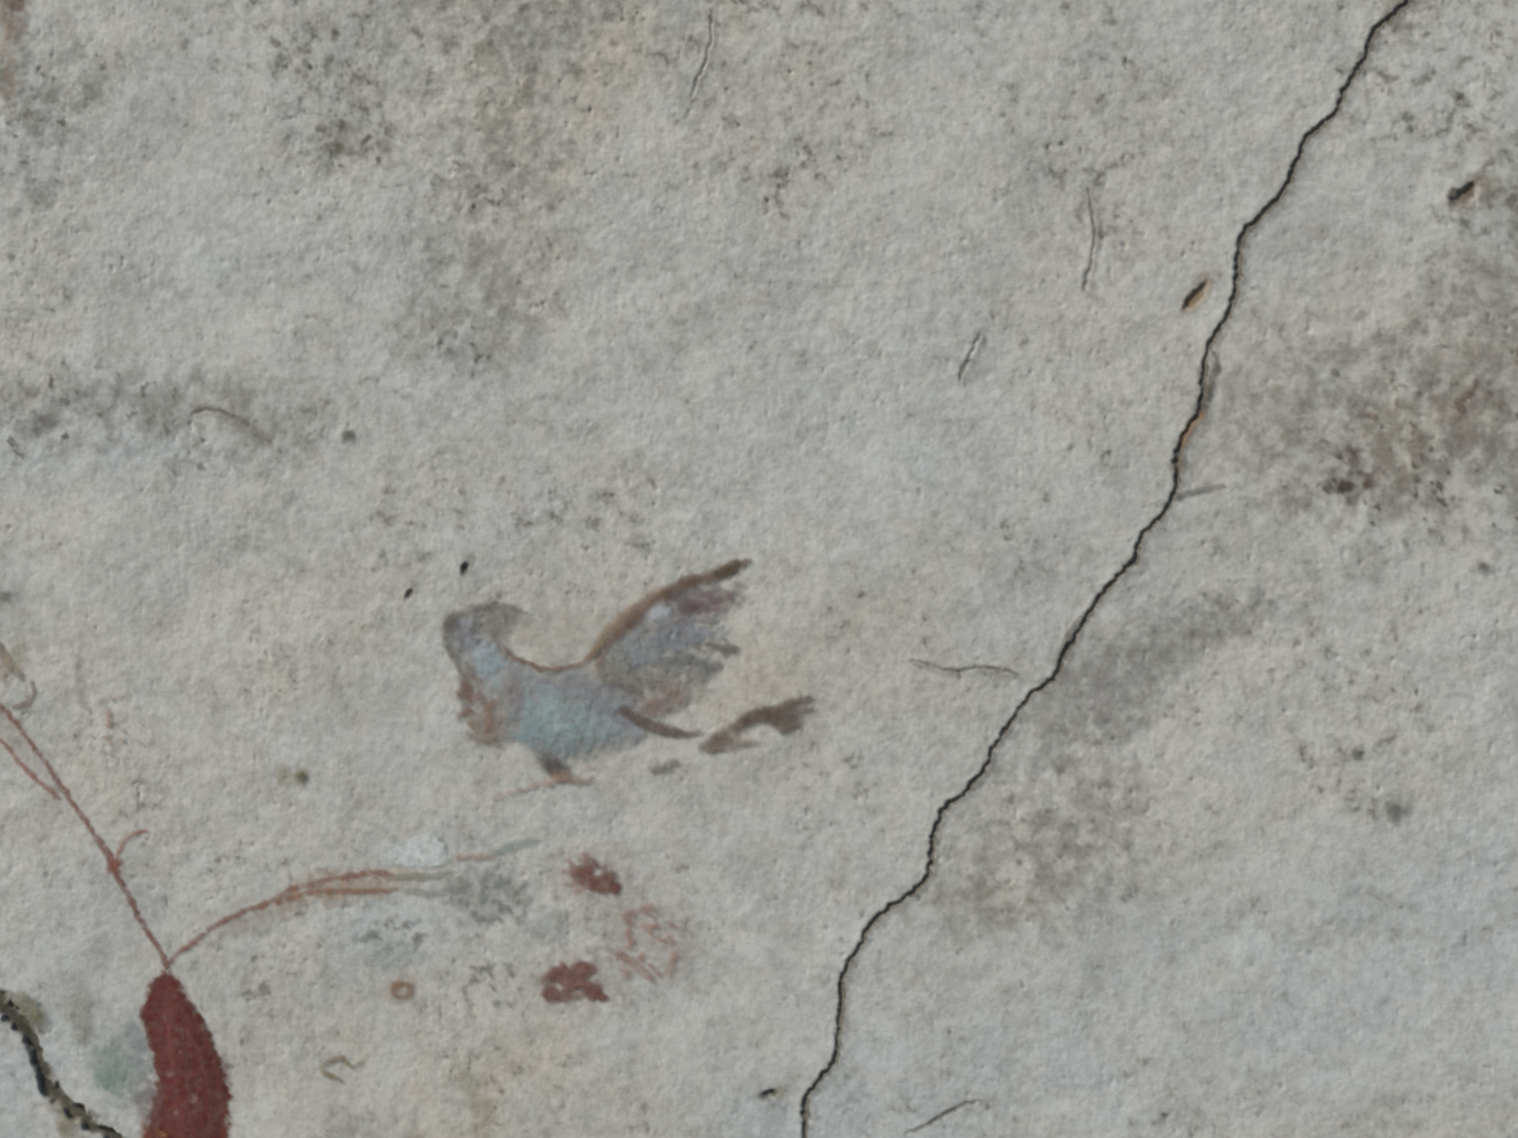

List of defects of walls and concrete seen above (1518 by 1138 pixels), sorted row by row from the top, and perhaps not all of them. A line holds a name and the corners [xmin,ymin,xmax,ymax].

crack [0,992,122,1138]
crack [801,0,1415,1138]